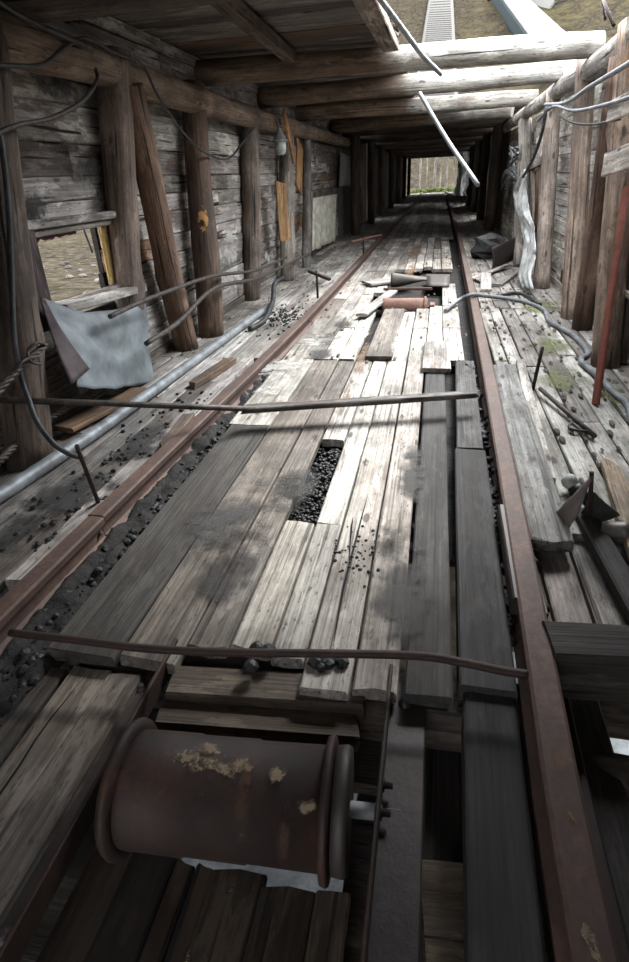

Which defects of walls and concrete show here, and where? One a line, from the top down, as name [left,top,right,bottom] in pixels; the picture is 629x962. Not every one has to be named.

peeling [173,743,253,777]
peeling [270,767,285,782]
peeling [300,802,317,814]